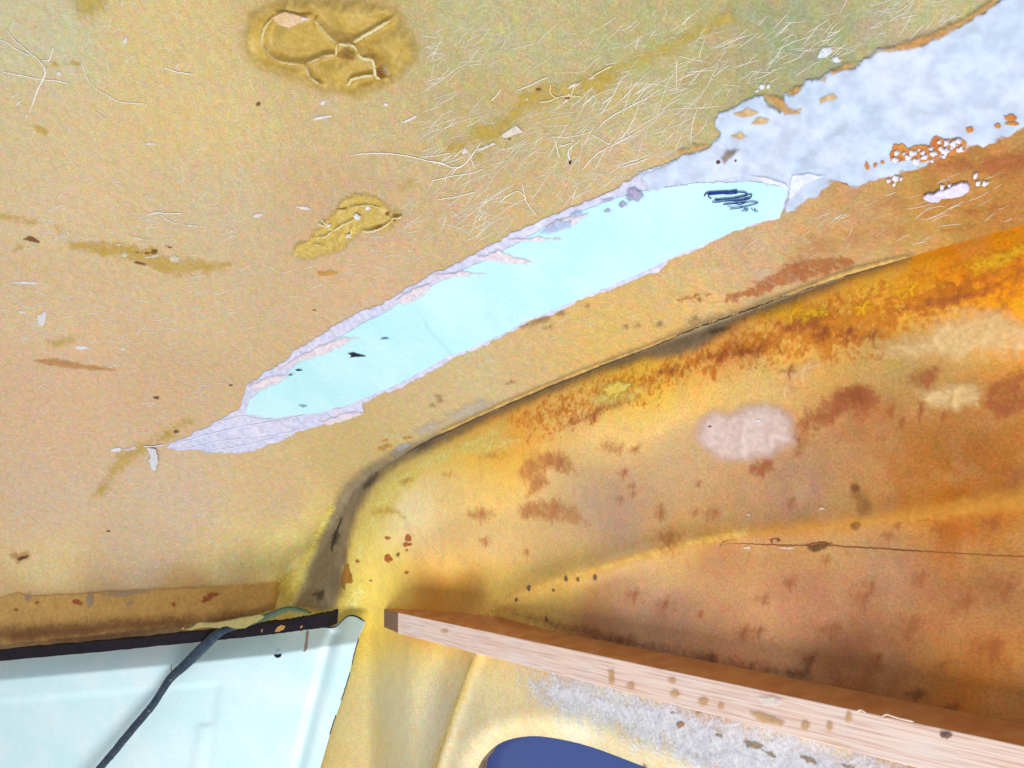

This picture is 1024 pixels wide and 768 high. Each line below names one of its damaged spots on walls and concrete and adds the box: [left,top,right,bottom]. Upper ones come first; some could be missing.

spalling [994,114,1019,129]
spalling [865,127,974,170]
leakage [57,232,231,277]
peeling [111,161,788,471]
corrosion [507,251,1024,443]
peeling [887,312,1024,358]
peeling [697,361,818,460]
peeling [923,385,979,410]
corrosion [522,453,570,491]
leakage [277,508,334,600]
corrosion [384,534,412,563]
crack [720,538,1024,557]